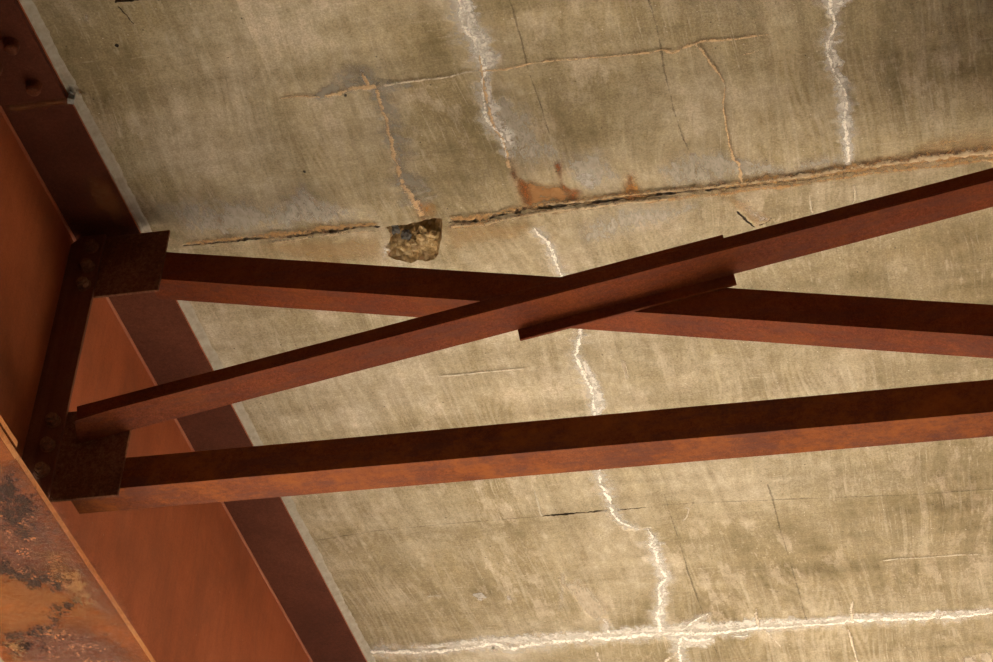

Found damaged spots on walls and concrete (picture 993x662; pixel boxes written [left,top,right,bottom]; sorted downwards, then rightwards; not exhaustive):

crack [280,0,853,277]
water stain [664,155,773,182]
rust [450,140,993,228]
crack [183,226,380,246]
spalling [384,218,443,263]
crack [574,329,605,415]
rust [0,472,128,662]